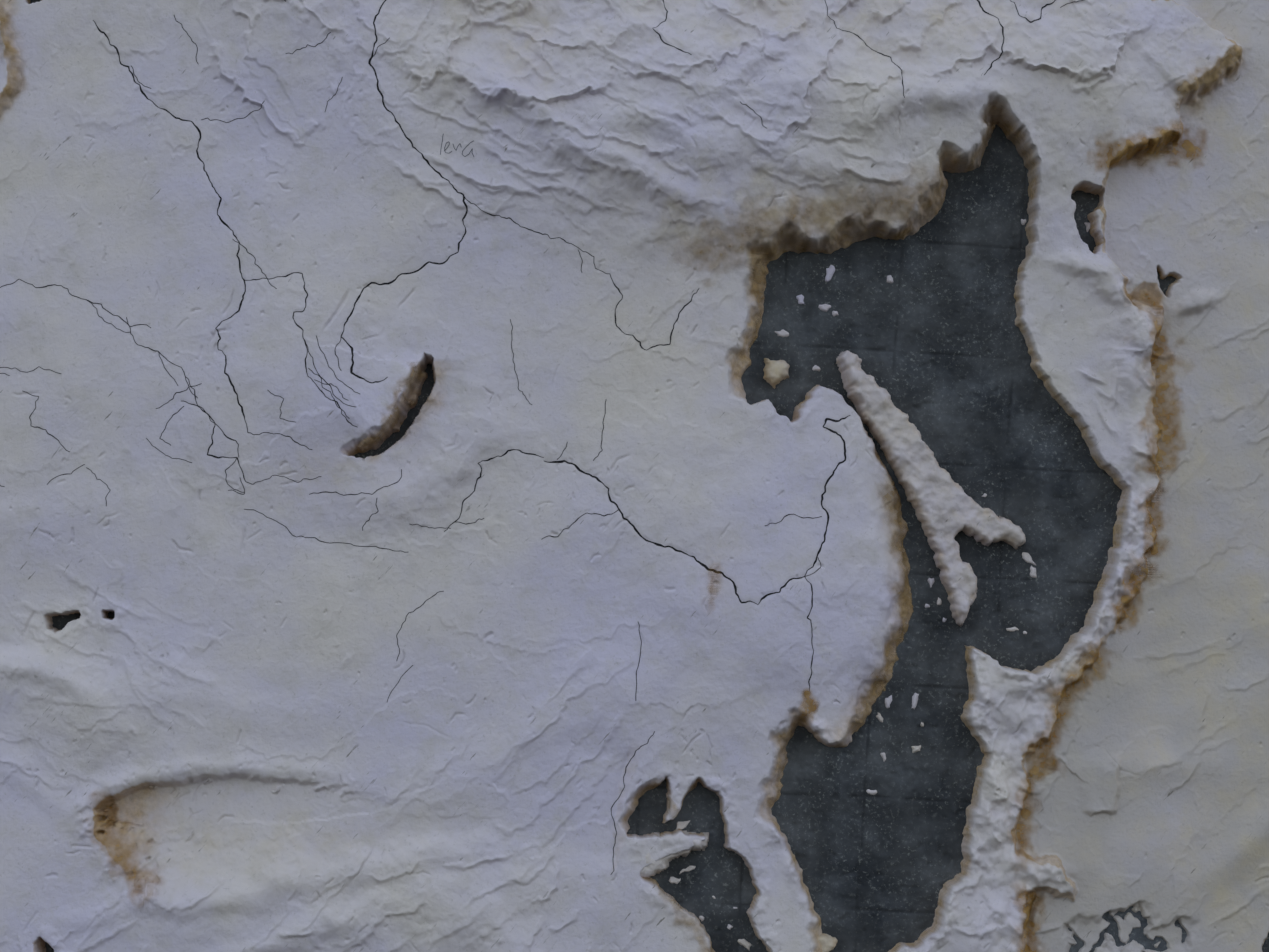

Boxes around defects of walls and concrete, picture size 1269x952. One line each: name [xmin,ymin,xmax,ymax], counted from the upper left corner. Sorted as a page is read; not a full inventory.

flaking render [0,0,25,125]
crack [825,1,905,98]
spalling [346,355,433,455]
crack [0,0,850,702]
flaking render [741,125,1159,952]
flaking render [627,779,768,952]
flaking render [1068,906,1187,952]